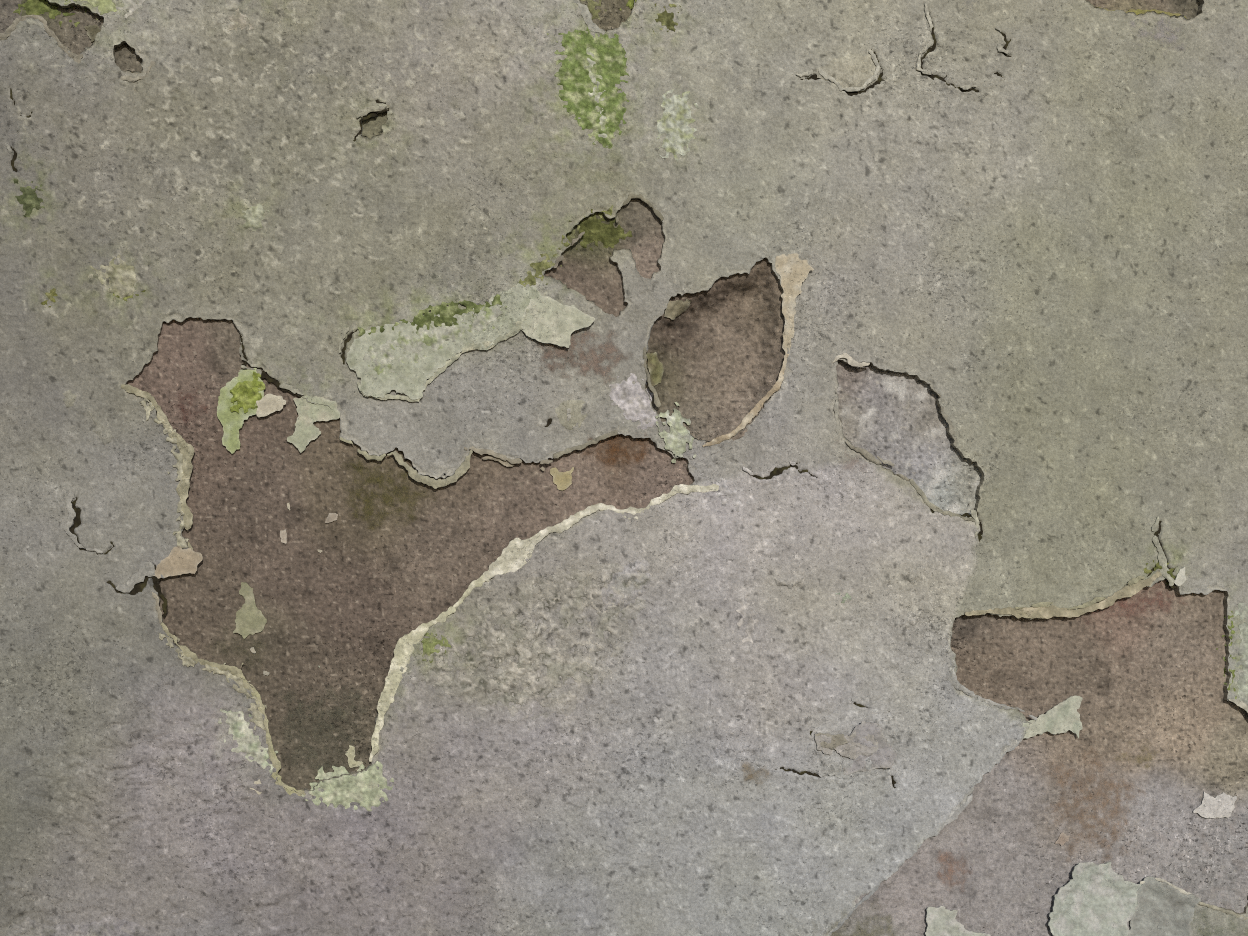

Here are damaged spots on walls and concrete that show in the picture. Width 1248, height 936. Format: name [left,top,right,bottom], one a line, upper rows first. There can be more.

peeling [0,0,104,64]
peeling [573,0,632,34]
crack [796,49,885,96]
crack [916,3,1012,93]
spalling [1087,0,1200,19]
peeling [346,193,664,402]
spalling [643,253,814,447]
peeling [832,353,981,522]
crack [64,491,167,618]
peeling [121,318,750,796]
peeling [831,567,1248,936]